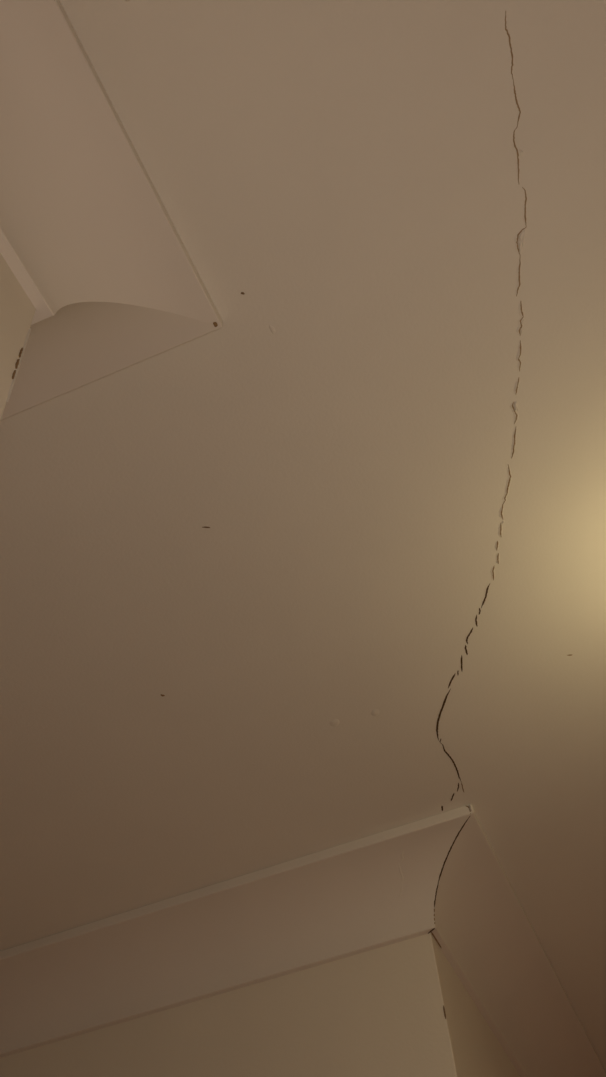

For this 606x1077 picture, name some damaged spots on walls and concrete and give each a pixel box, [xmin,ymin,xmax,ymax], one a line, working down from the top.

crack [428,11,529,947]